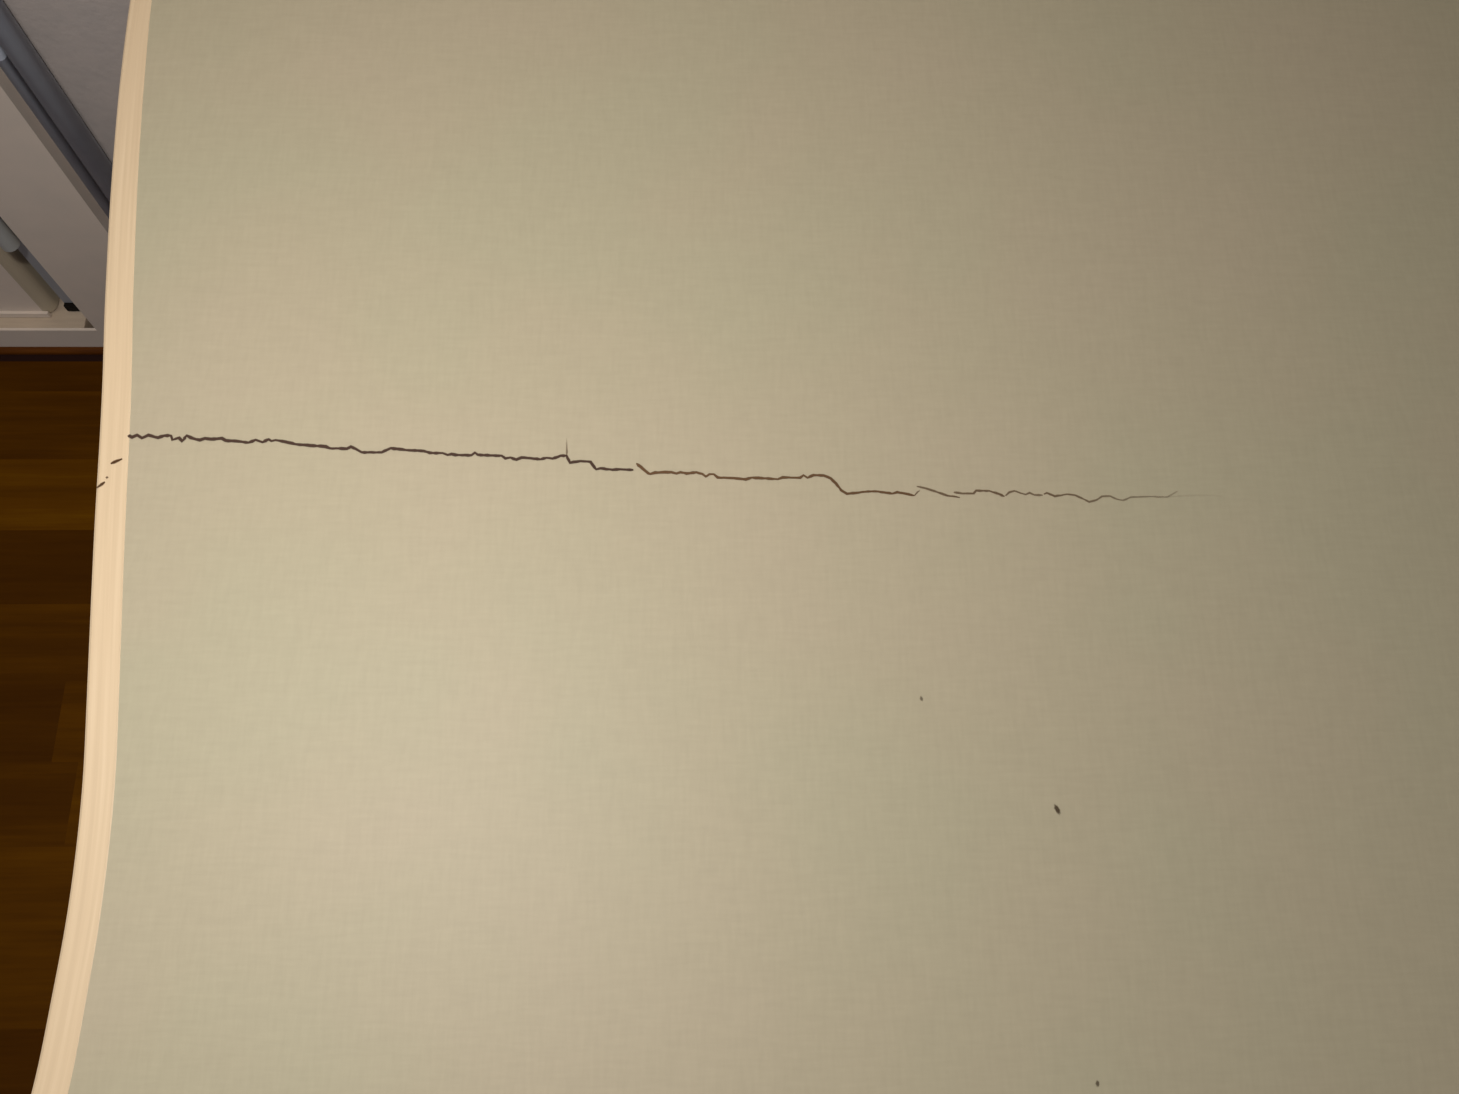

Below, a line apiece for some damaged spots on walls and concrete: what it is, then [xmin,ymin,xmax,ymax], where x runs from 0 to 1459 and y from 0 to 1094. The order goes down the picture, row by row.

crack [96,434,1100,503]